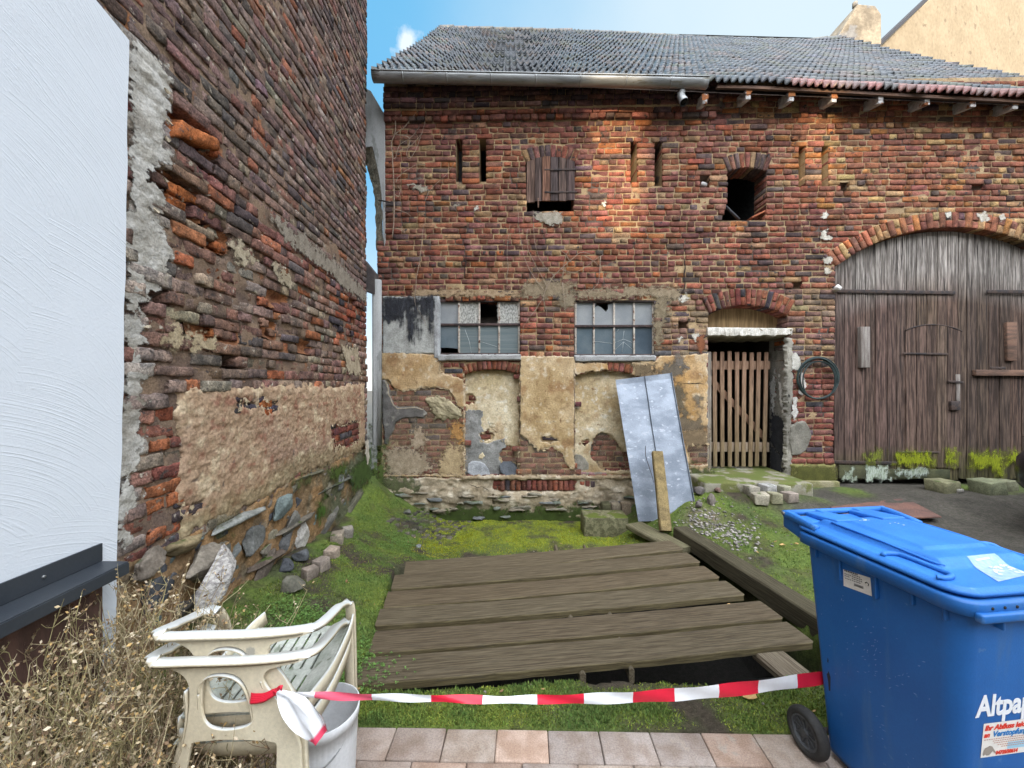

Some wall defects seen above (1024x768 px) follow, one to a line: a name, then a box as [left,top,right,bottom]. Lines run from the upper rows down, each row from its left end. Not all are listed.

peeling [117,40,229,558]
leakage [382,295,435,344]
flaking render [438,361,466,379]
flaking render [234,396,279,415]
flaking render [331,385,581,480]
flaking render [581,433,630,471]